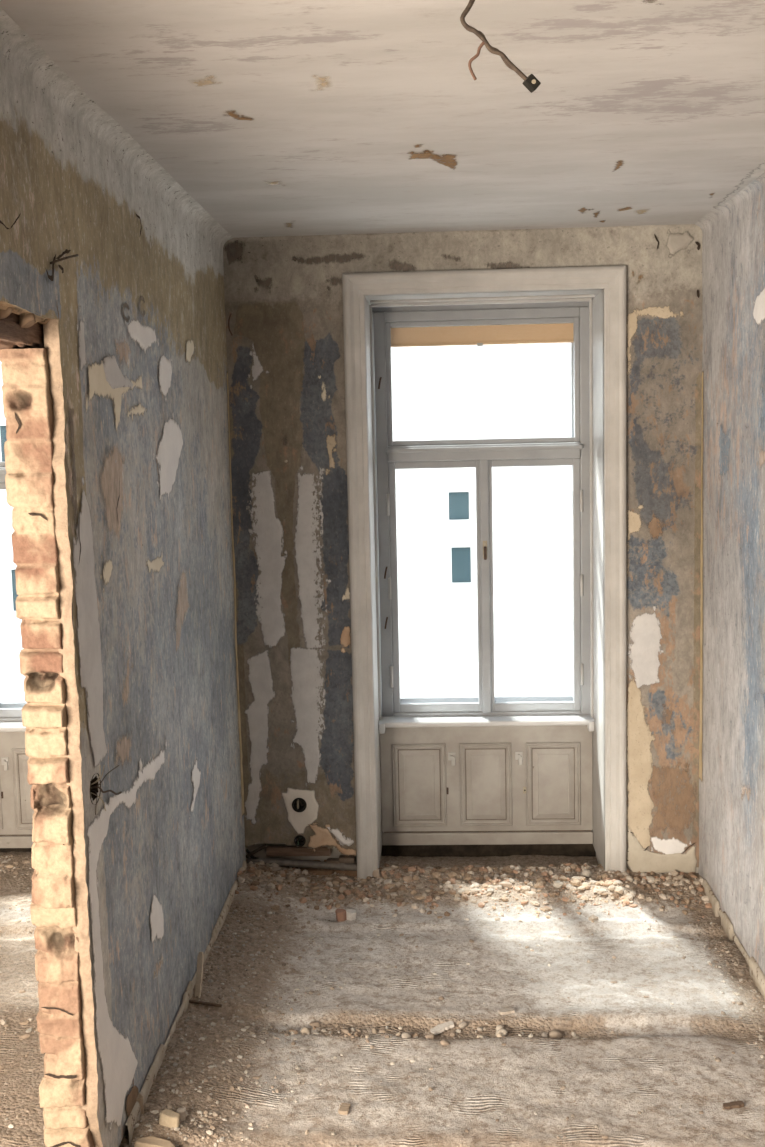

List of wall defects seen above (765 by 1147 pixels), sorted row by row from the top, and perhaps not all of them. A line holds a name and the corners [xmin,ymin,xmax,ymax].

peeling [408,145,457,169]
spalling [0,301,56,328]
peeling [67,355,147,545]
peeling [319,434,337,475]
peeling [627,505,665,576]
peeling [100,556,113,591]
spalling [340,627,351,653]
spalling [0,348,95,1147]
spalling [87,737,142,837]
spalling [626,677,697,874]
spalling [126,1078,138,1118]